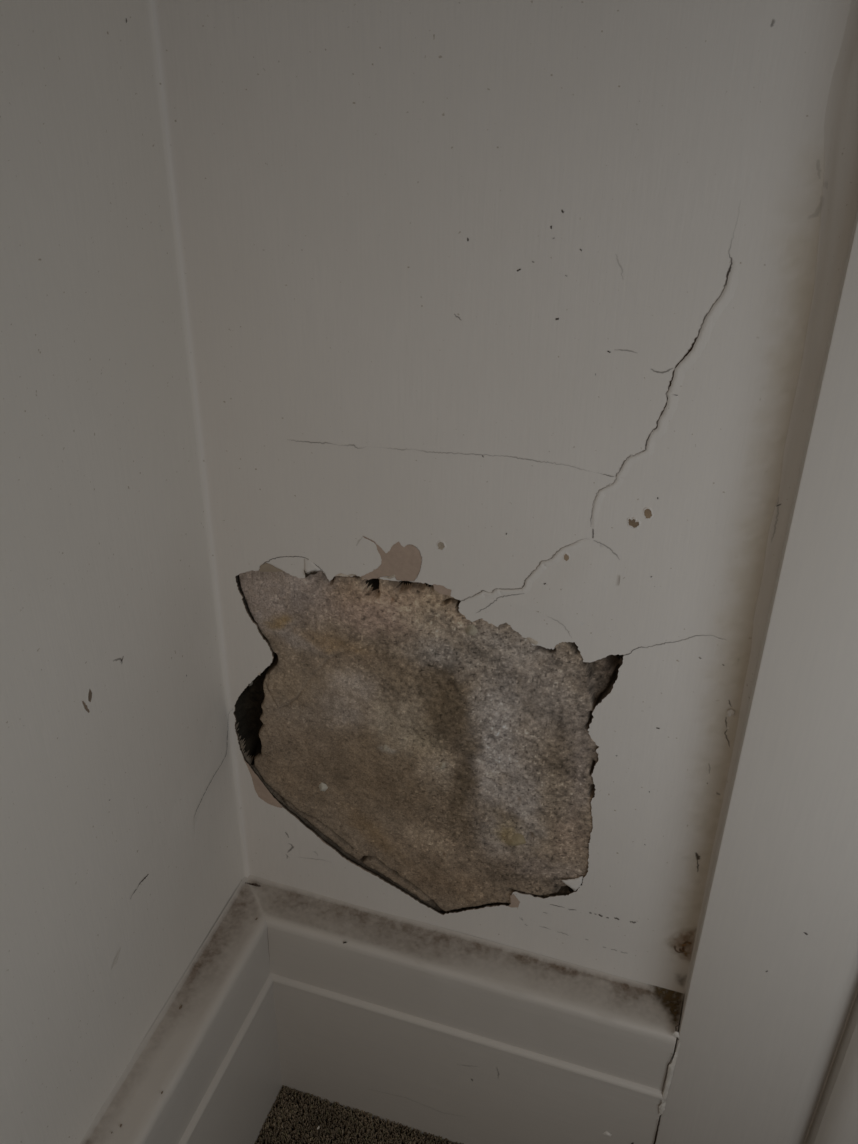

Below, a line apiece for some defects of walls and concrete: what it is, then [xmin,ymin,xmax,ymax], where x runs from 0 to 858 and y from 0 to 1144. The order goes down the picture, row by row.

crack [462,259,740,605]
spalling [233,536,624,915]
crack [653,1024,681,1144]
damp [655,986,682,1022]